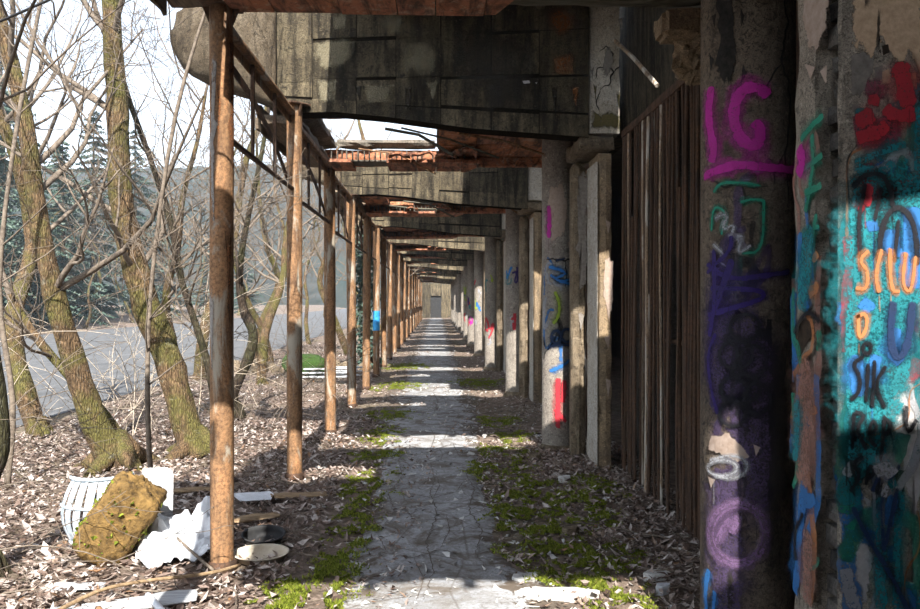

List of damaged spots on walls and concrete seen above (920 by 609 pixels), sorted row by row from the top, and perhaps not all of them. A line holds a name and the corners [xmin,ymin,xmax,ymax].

rust [217,42,234,150]
water stain [319,81,336,100]
water stain [317,40,350,67]
water stain [355,86,390,102]
water stain [455,20,534,111]
crack [595,46,620,110]
spalling [671,0,747,86]
peeling [851,0,920,93]